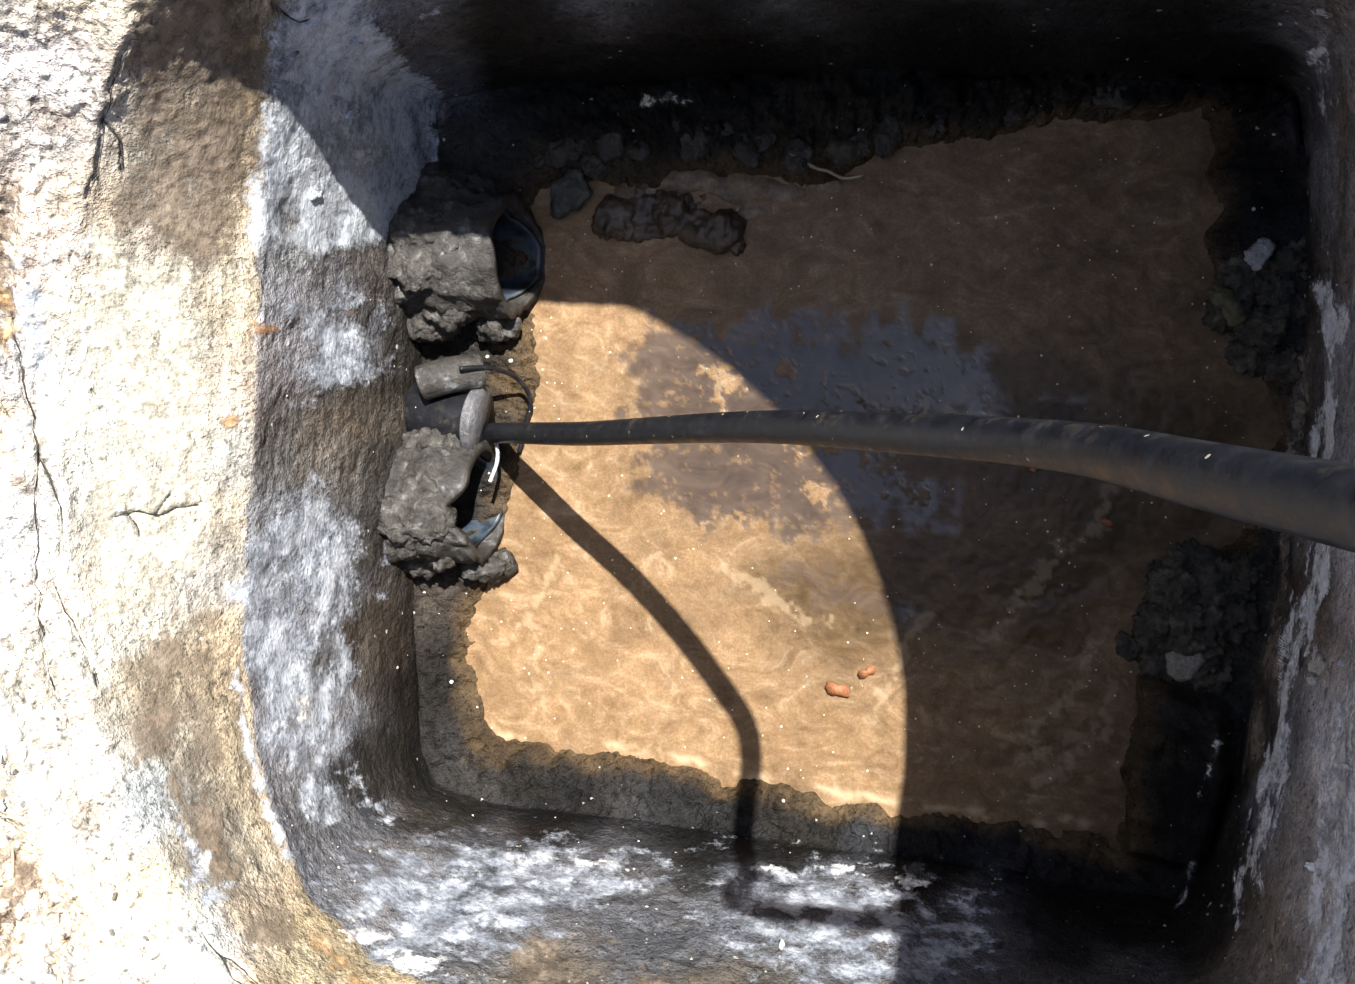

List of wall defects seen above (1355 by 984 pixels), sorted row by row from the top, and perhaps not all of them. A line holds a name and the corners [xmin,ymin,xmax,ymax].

crack [89,38,132,190]
damp [1307,3,1351,227]
damp [289,290,393,407]
damp [1285,281,1350,460]
crack [12,316,99,724]
damp [124,632,241,905]
damp [230,471,395,828]
damp [311,832,669,984]
damp [686,857,1000,984]
damp [1234,533,1331,931]
damp [1298,641,1355,984]